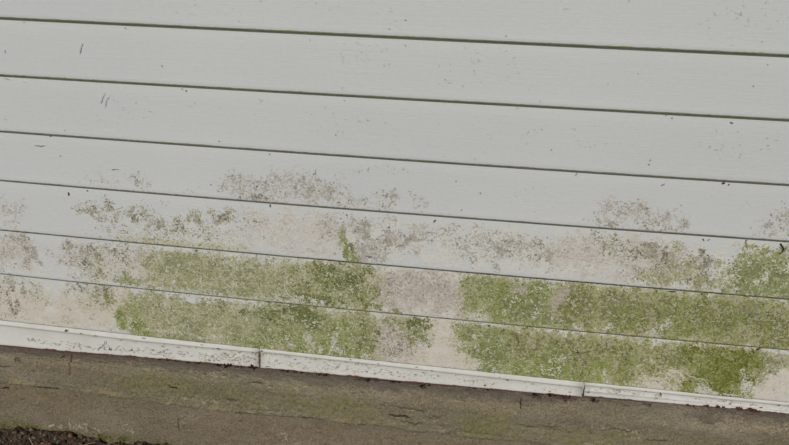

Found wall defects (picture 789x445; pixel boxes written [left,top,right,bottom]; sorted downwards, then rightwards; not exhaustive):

leakage [0,160,716,362]
leakage [750,201,789,281]